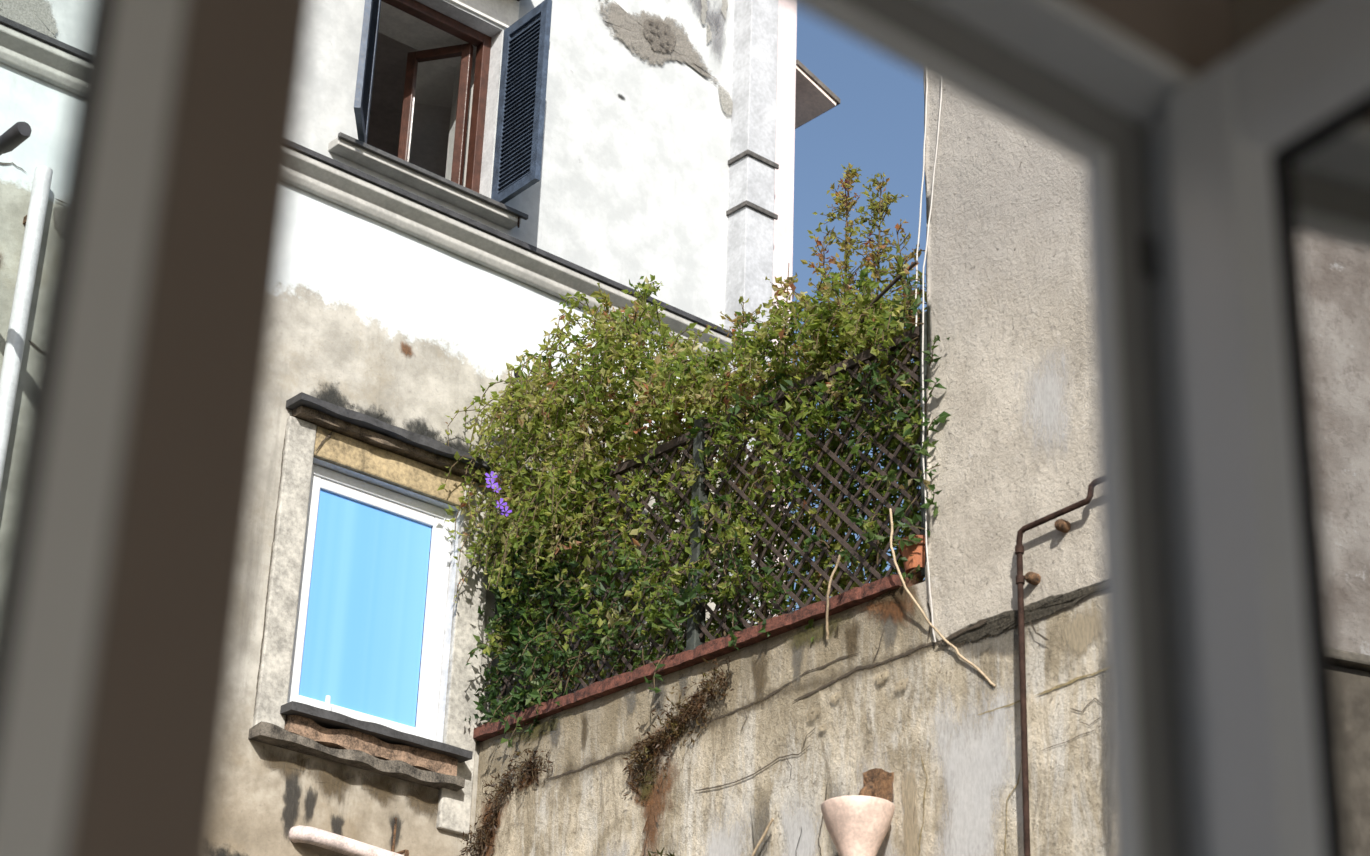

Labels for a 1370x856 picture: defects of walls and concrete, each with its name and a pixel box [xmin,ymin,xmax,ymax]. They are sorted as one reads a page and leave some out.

flaking render [0,0,58,40]
flaking render [599,0,733,115]
leakage [316,385,471,454]
leakage [654,676,687,715]
crack [537,602,938,791]
leakage [752,652,766,701]
leakage [793,640,802,681]
leakage [846,623,858,658]
leakage [266,752,439,836]
leakage [390,816,401,846]